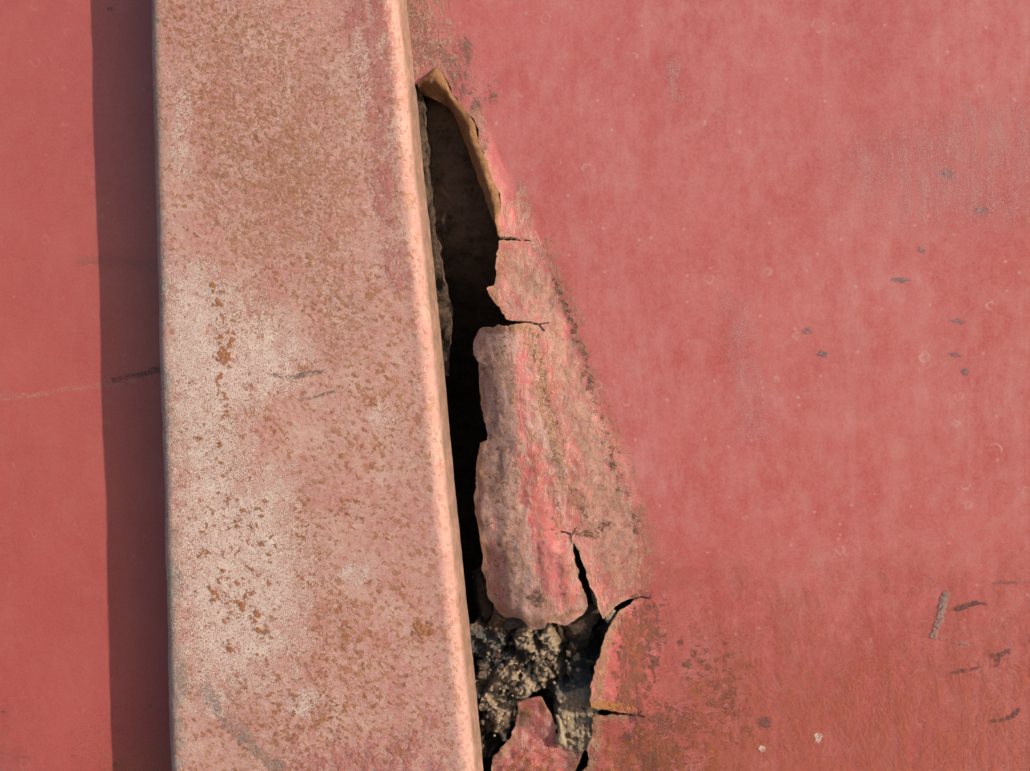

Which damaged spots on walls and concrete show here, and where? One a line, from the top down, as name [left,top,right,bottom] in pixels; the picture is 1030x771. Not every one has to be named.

corrosion [186,459,380,771]
corrosion [154,0,417,479]
corrosion [410,618,435,645]
peeling [494,708,548,760]
peeling [495,179,660,606]
peeling [573,716,627,771]
corrosion [476,237,785,771]